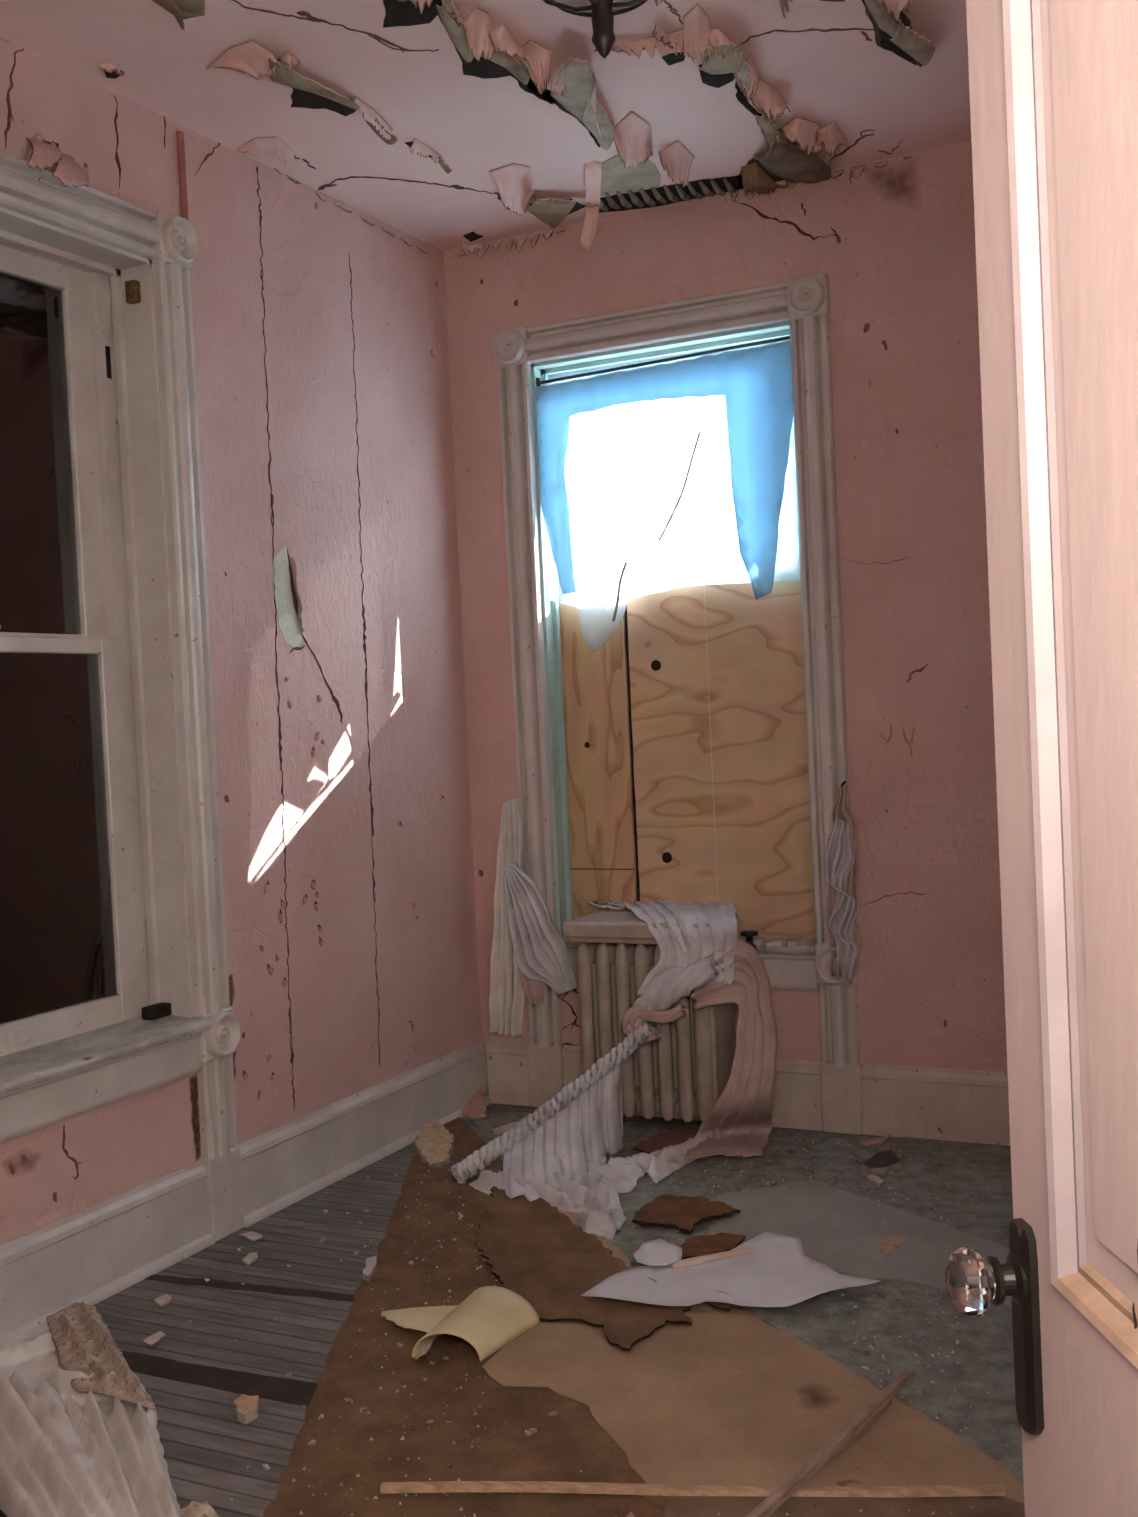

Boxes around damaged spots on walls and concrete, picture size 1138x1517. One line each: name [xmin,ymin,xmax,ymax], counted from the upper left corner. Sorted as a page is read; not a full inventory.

crack [4,49,24,148]
spalling [99,63,124,79]
crack [113,96,121,187]
peeling [206,40,453,174]
crack [231,0,439,53]
peeling [274,168,427,254]
crack [294,155,496,194]
peeling [383,0,911,259]
crack [730,195,838,241]
peeling [820,0,936,67]
spalling [273,546,305,648]
crack [256,167,380,1110]